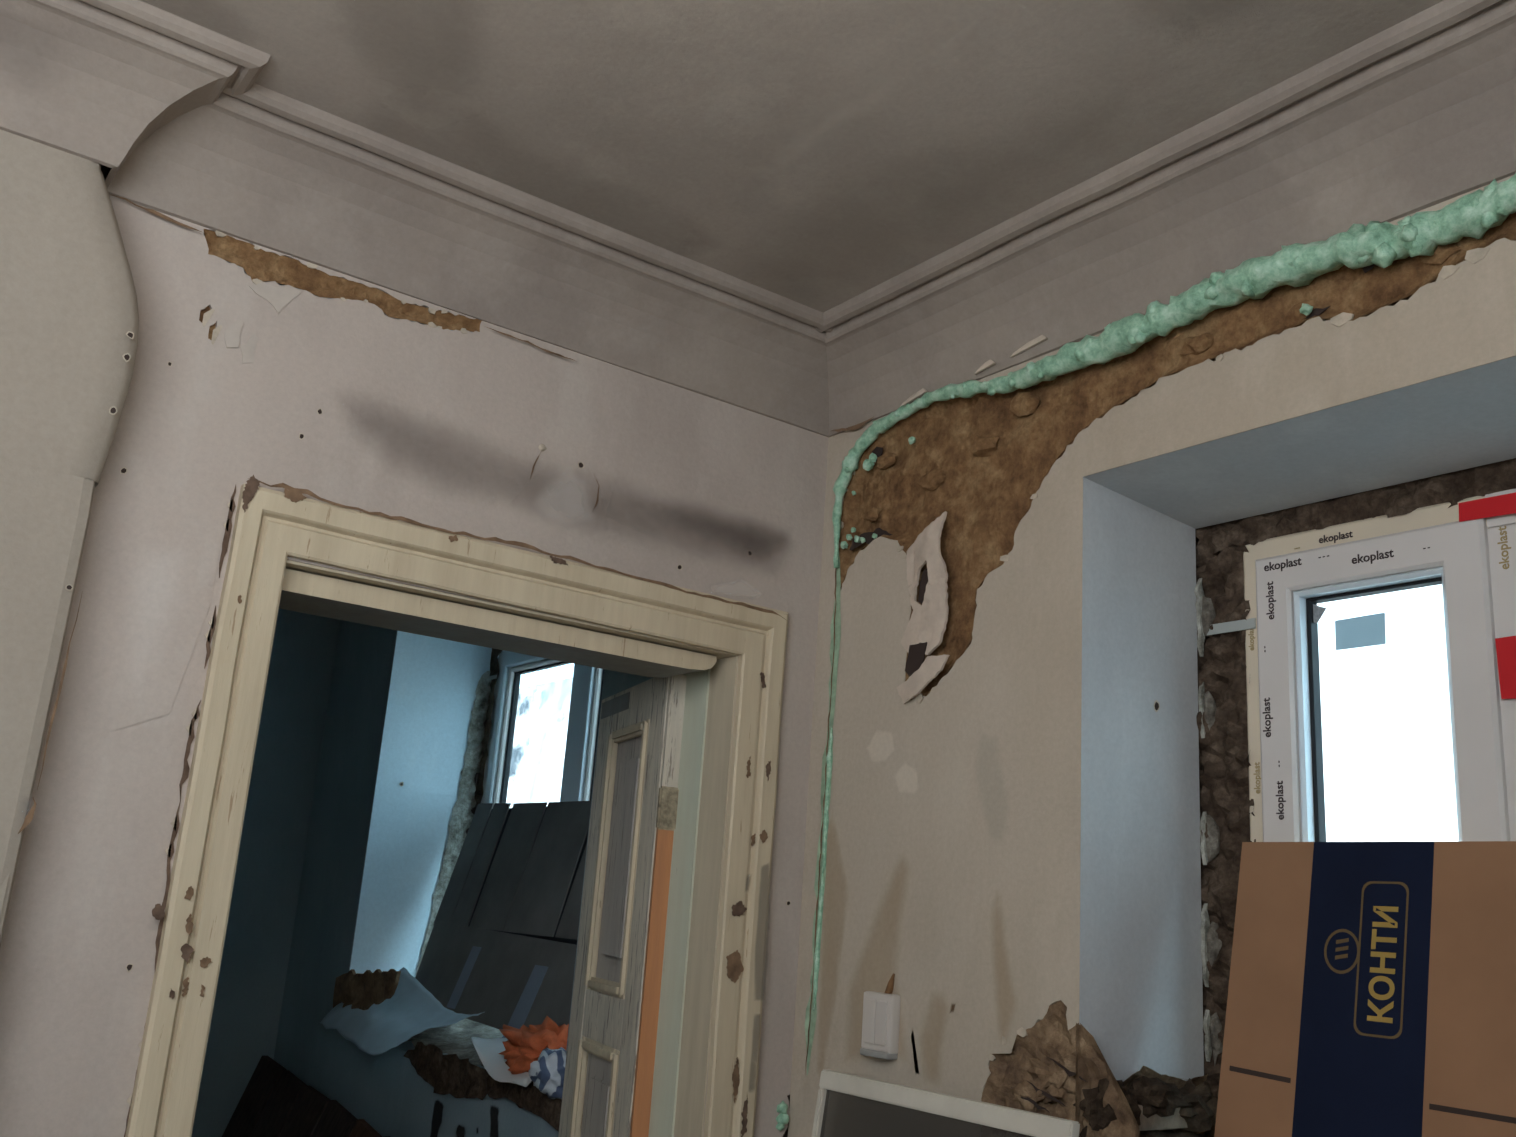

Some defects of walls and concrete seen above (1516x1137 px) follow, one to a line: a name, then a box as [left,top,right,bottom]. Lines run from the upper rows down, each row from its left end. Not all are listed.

spalling [204,229,482,334]
spalling [839,212,1516,704]
flaking render [981,528,1256,1137]